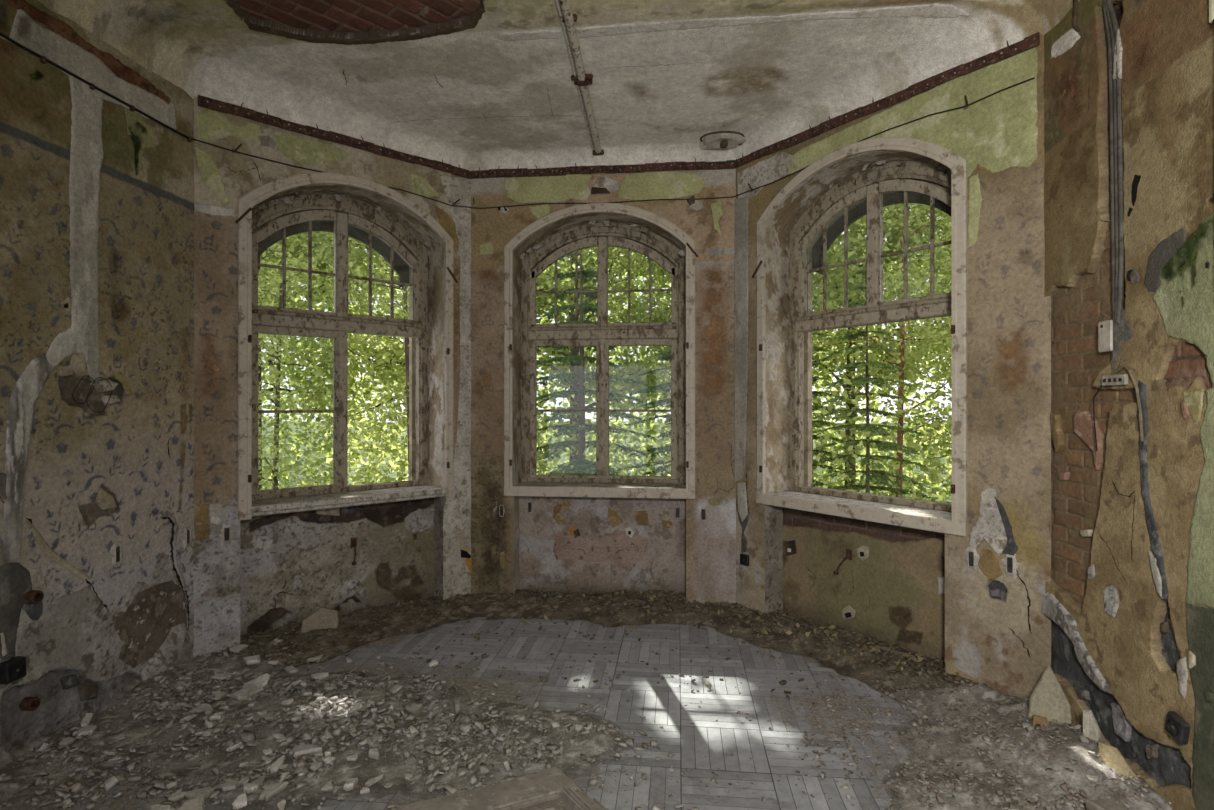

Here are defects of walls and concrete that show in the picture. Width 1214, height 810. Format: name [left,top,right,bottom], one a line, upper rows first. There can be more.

flaking render [244,8,486,45]
flaking render [1113,4,1123,26]
flaking render [1123,165,1141,217]
flaking render [58,376,124,417]
flaking render [79,484,120,528]
peeling [182,504,233,549]
flaking render [249,498,434,555]
peeling [1050,200,1214,810]
crack [161,511,189,628]
peeling [963,546,1019,601]
flaking render [0,580,190,753]